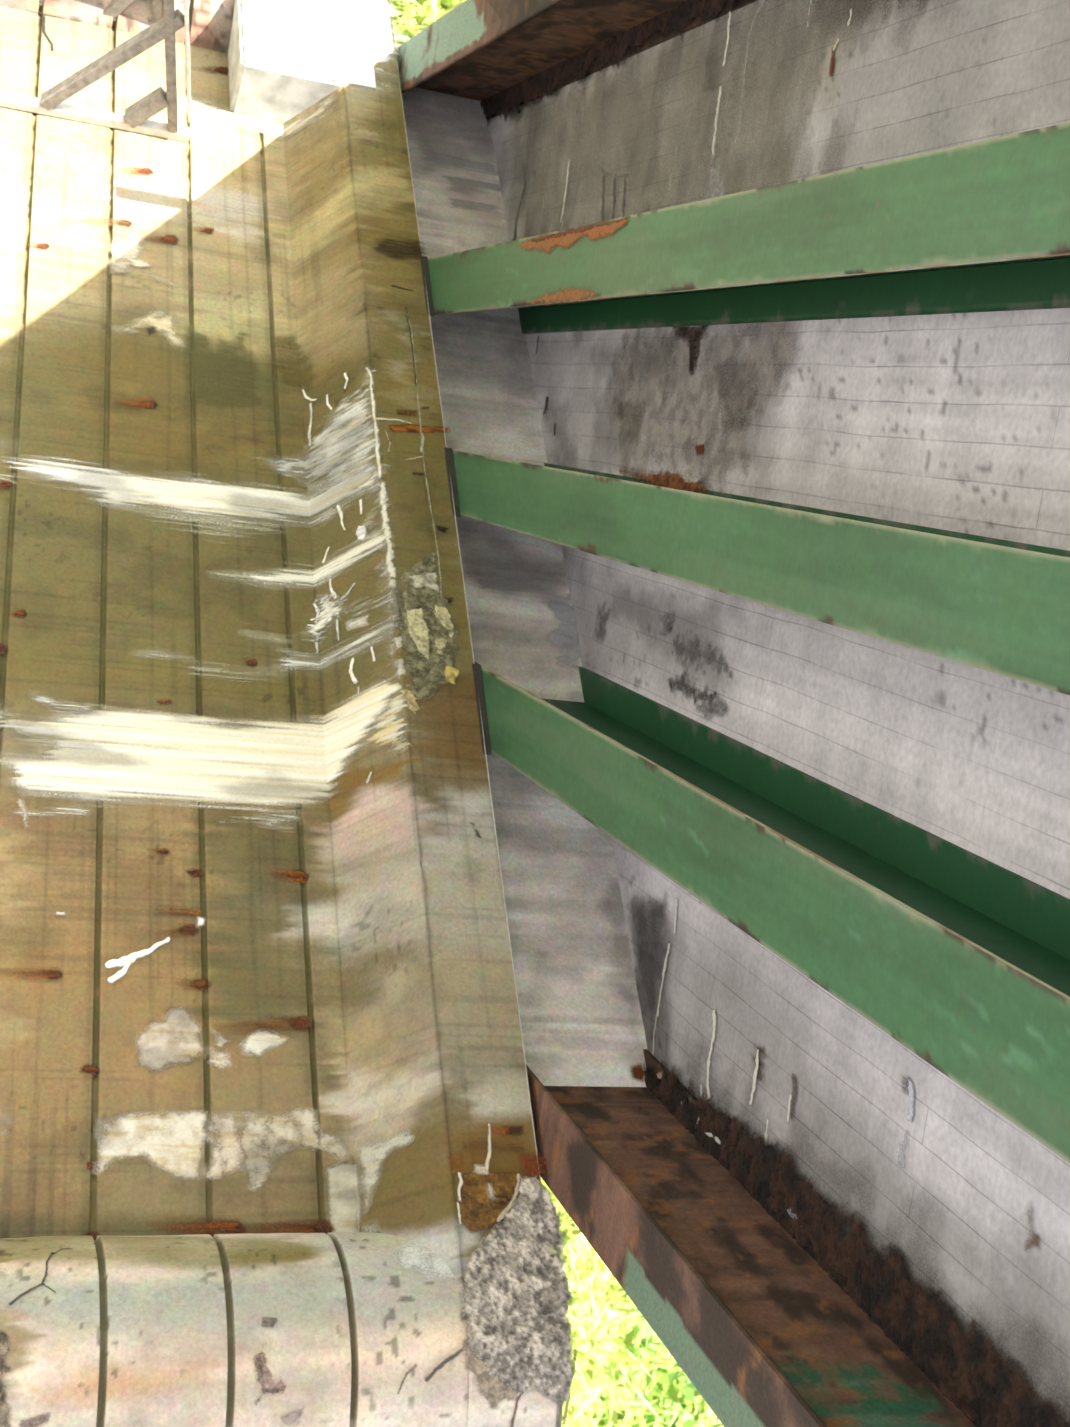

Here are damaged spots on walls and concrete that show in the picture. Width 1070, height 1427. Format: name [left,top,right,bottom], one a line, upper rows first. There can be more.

rust [528,288,599,305]
damp [607,322,794,483]
rust [620,469,708,493]
damp [0,331,411,825]
spalling [390,552,460,712]
mould [663,615,732,717]
peeling [135,1008,288,1071]
peeling [96,1109,413,1233]
crack [9,1249,63,1305]
rust [167,1220,334,1237]
spalling [457,1172,574,1408]
rust [1026,1209,1039,1249]